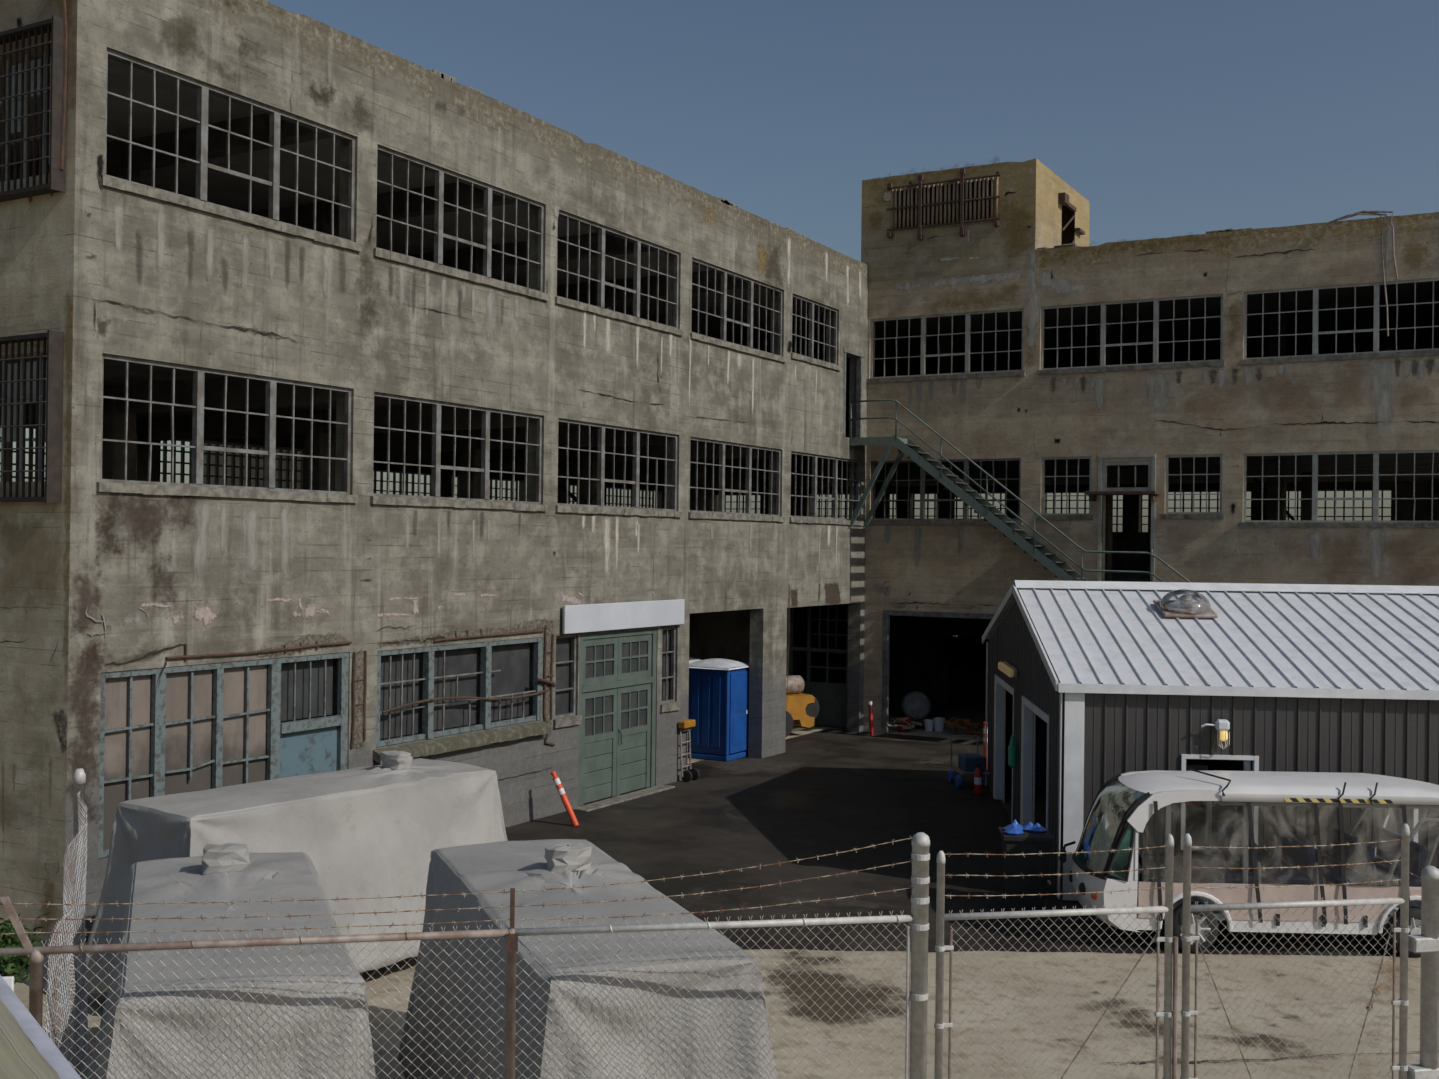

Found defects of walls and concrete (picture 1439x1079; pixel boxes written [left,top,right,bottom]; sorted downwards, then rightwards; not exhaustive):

crack [94,300,303,343]
crack [1155,414,1439,436]